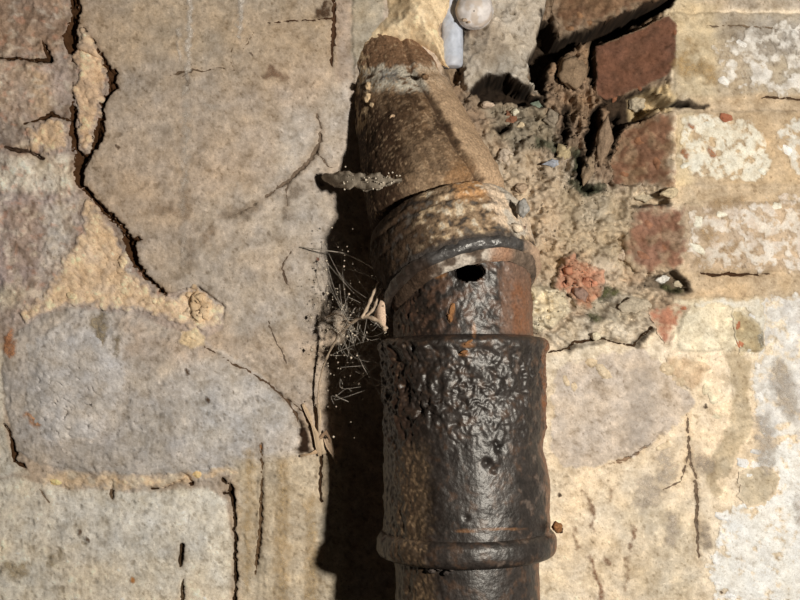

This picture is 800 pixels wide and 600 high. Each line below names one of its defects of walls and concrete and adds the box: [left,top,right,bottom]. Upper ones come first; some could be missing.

spalling [551,0,661,38]
spalling [595,14,678,103]
crack [0,0,167,295]
spalling [19,199,225,349]
spalling [551,251,606,310]
crack [700,270,769,278]
crack [548,326,653,353]
crack [204,346,310,427]
crack [221,443,264,600]
crack [663,414,700,558]